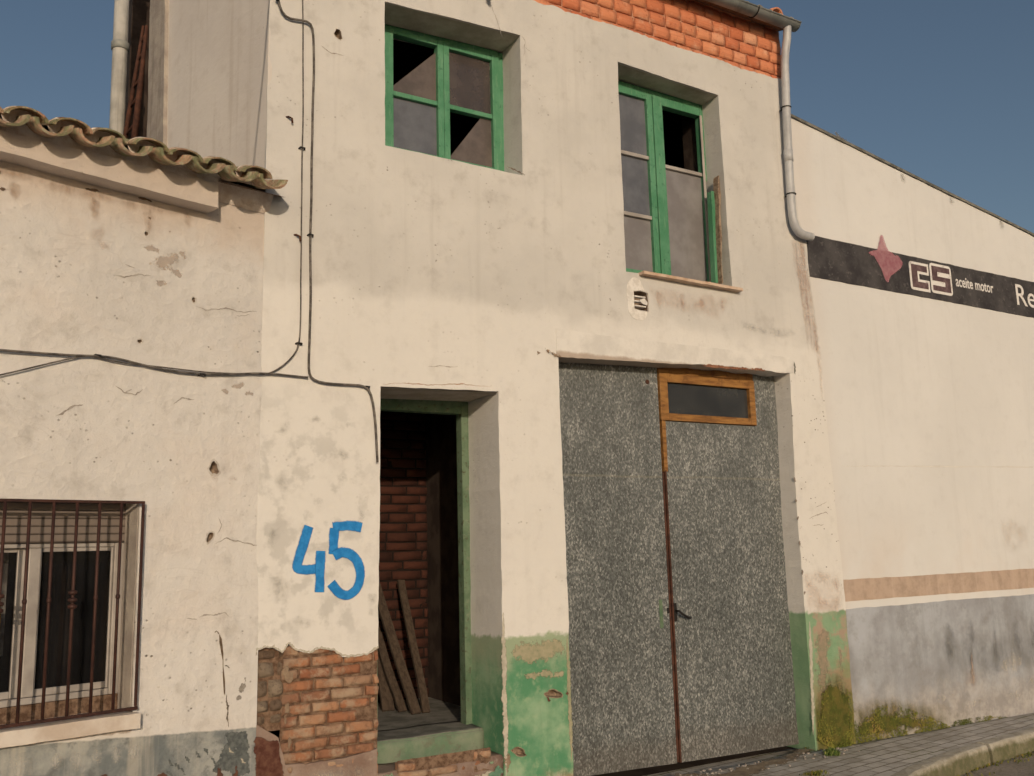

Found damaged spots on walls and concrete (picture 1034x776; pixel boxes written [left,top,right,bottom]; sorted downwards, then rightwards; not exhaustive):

flaking render [207,459,221,476]
crack [217,517,257,546]
peeling [513,639,569,702]
flaking render [158,633,527,776]